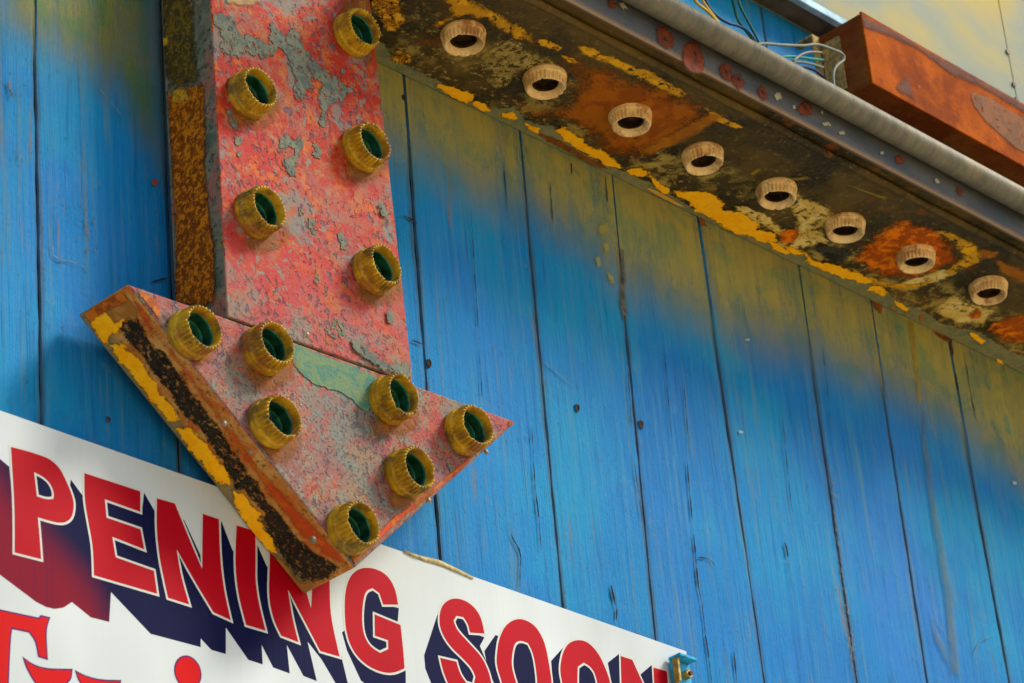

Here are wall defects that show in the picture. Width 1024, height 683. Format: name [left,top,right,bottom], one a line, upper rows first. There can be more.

peeling [436,0,686,97]
rust [657,25,704,73]
peeling [436,83,541,133]
rust [556,64,721,155]
peeling [707,109,743,128]
rust [862,18,1024,152]
peeling [554,126,981,320]
rust [854,221,954,278]
rust [988,314,1024,343]